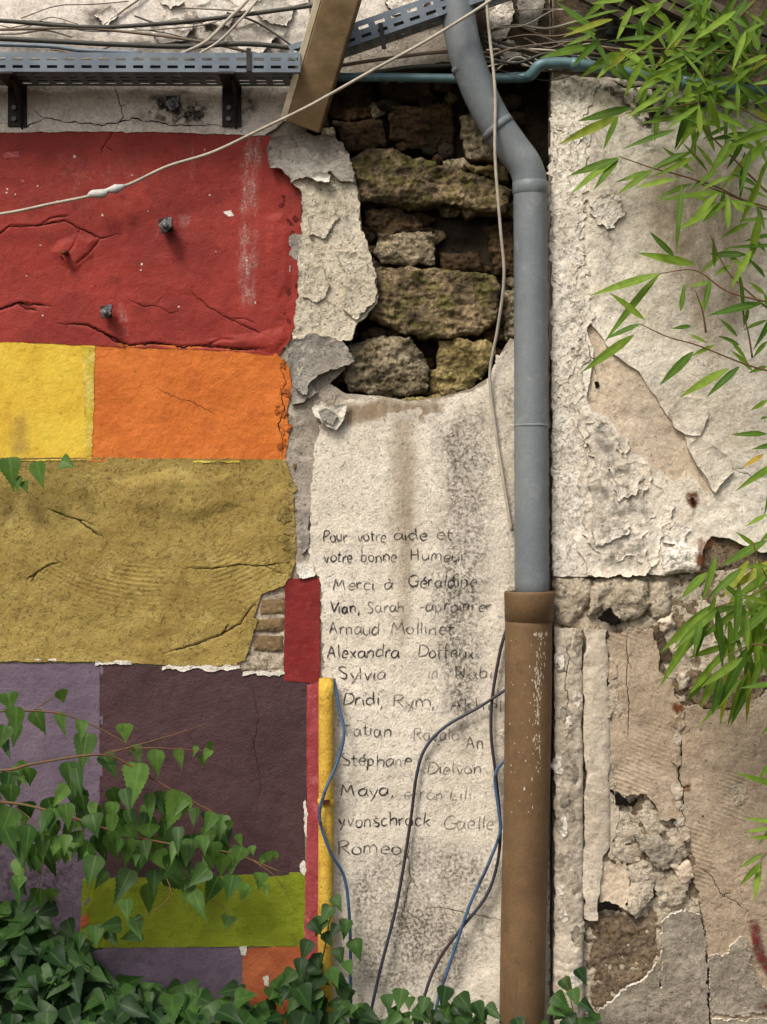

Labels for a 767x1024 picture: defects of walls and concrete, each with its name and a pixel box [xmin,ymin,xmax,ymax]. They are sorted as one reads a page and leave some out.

peeling [385,0,428,16]
crack [24,86,222,152]
crack [0,215,122,243]
crack [0,293,260,350]
spalling [162,72,514,677]
peeling [475,0,767,846]
leakage [447,425,478,522]
rust [687,493,698,508]
crack [183,562,289,574]
crack [162,596,263,654]
crack [677,734,691,823]
spalling [555,768,767,1024]